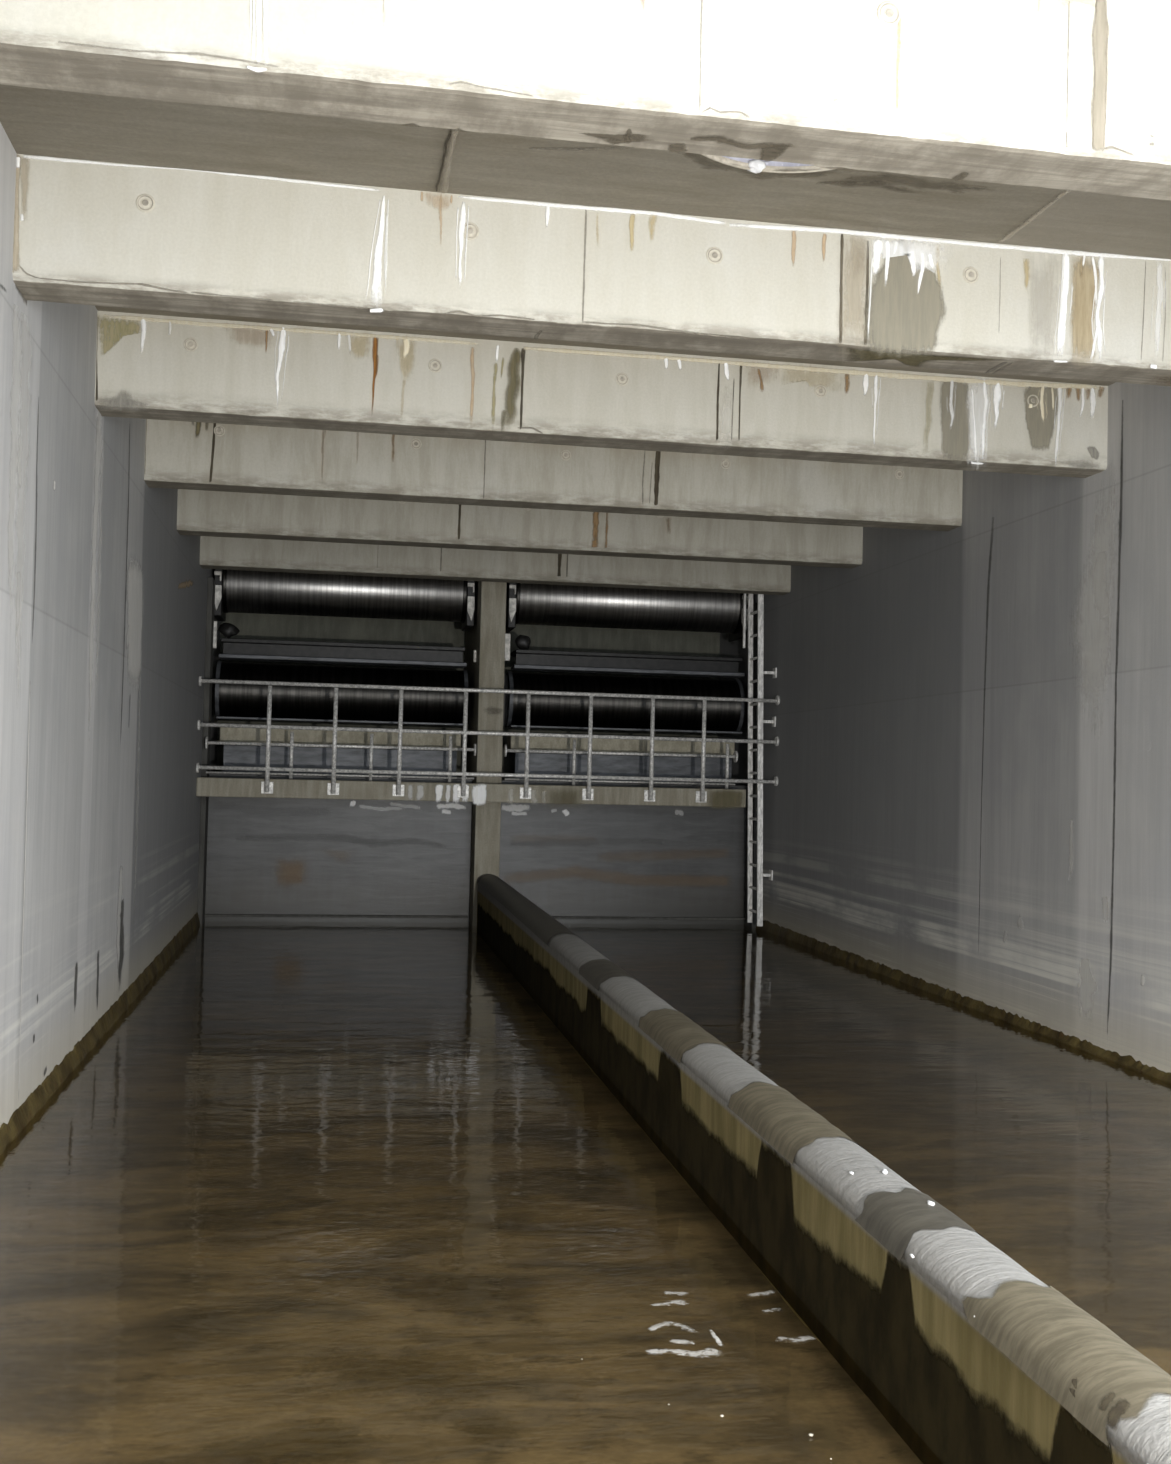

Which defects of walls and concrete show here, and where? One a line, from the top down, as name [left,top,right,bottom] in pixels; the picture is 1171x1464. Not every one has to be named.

corrosion [1092,0,1109,150]
water stain [584,129,644,144]
water stain [456,196,1171,362]
water stain [115,316,476,400]
water stain [496,345,1096,464]